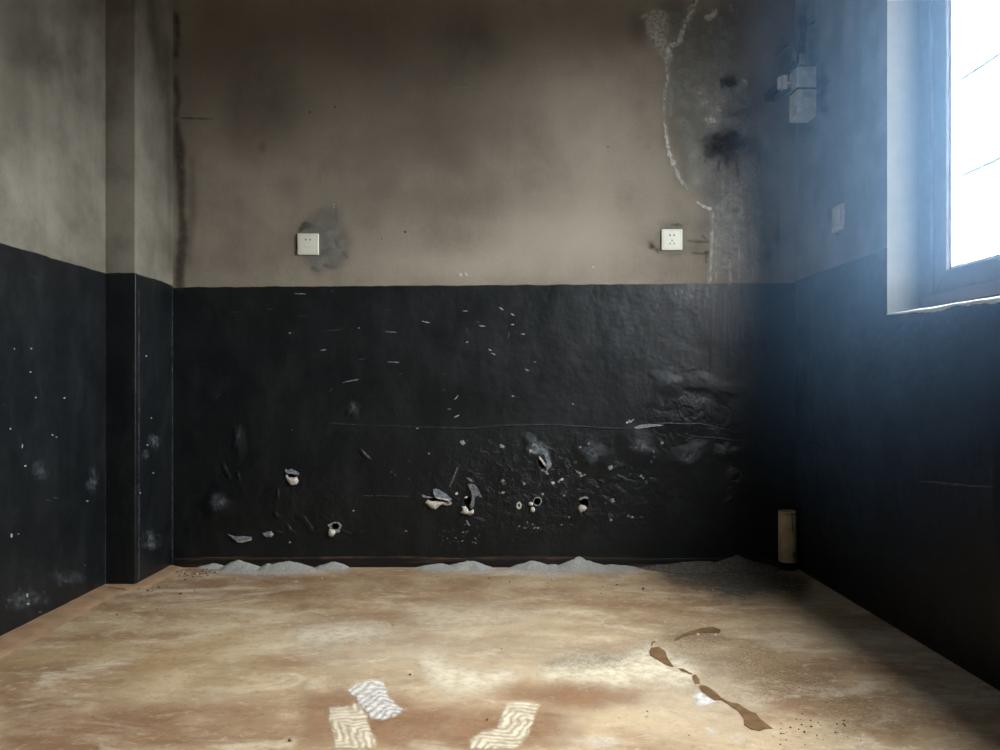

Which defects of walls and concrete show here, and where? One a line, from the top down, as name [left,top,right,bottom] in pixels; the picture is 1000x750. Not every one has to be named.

water stain [175,123,187,287]
water stain [709,190,744,357]
crack [331,423,632,431]
crack [655,422,795,443]
spalling [285,469,300,485]
spalling [507,433,590,533]
spalling [422,470,485,550]
peeling [229,531,274,543]
spalling [328,522,342,537]